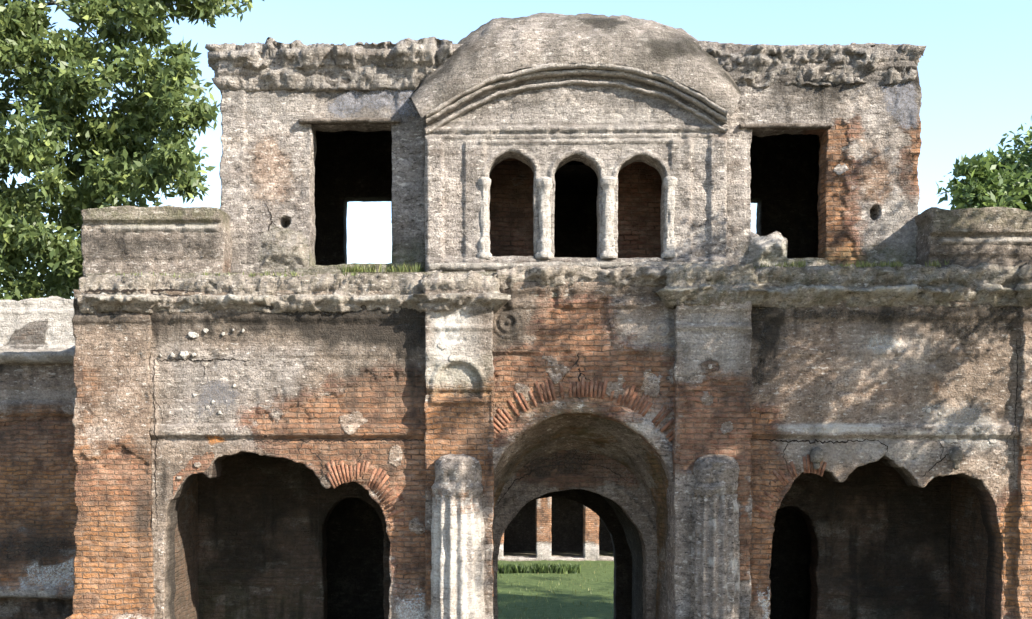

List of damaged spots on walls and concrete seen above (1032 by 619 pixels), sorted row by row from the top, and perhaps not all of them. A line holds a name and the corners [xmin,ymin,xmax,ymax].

flaking render [825,119,892,261]
flaking render [0,415,153,619]
flaking render [246,298,787,603]
crack [562,347,594,400]
crack [756,439,888,464]
flaking render [999,452,1032,616]